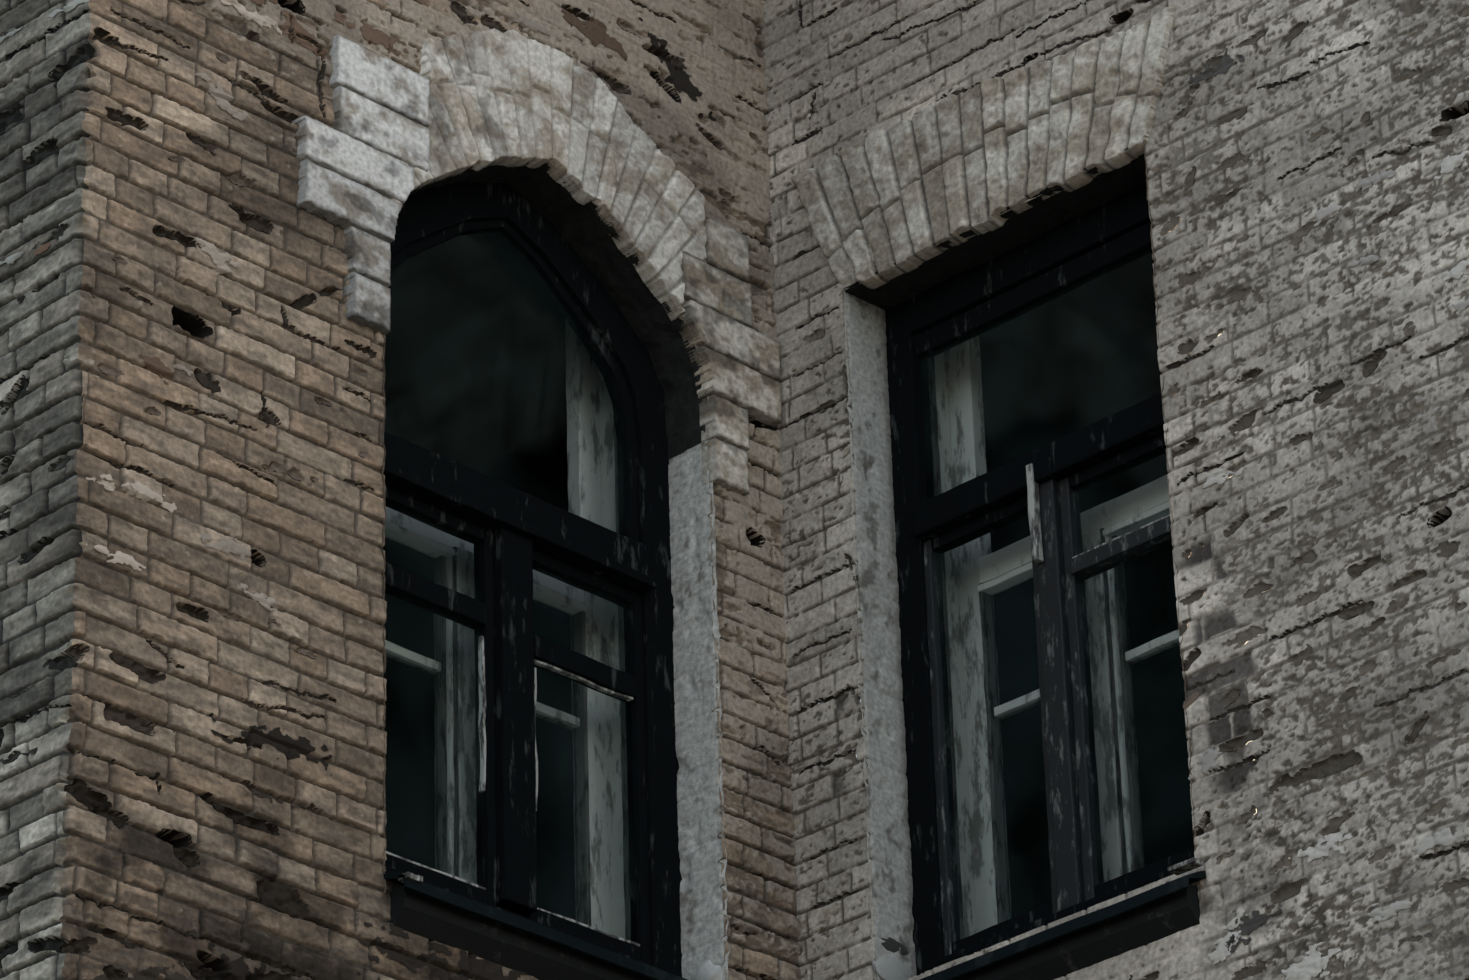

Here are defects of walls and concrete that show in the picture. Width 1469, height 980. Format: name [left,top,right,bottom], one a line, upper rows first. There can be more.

spalling [617,18,687,103]
spalling [217,52,299,125]
spalling [171,306,213,338]
crack [748,563,851,615]
crack [792,629,852,659]
spalling [1287,644,1313,667]
crack [750,677,854,714]
spalling [1339,660,1376,702]
spalling [1206,708,1272,754]
crack [754,745,856,775]
spalling [64,778,129,830]
spalling [156,828,200,867]